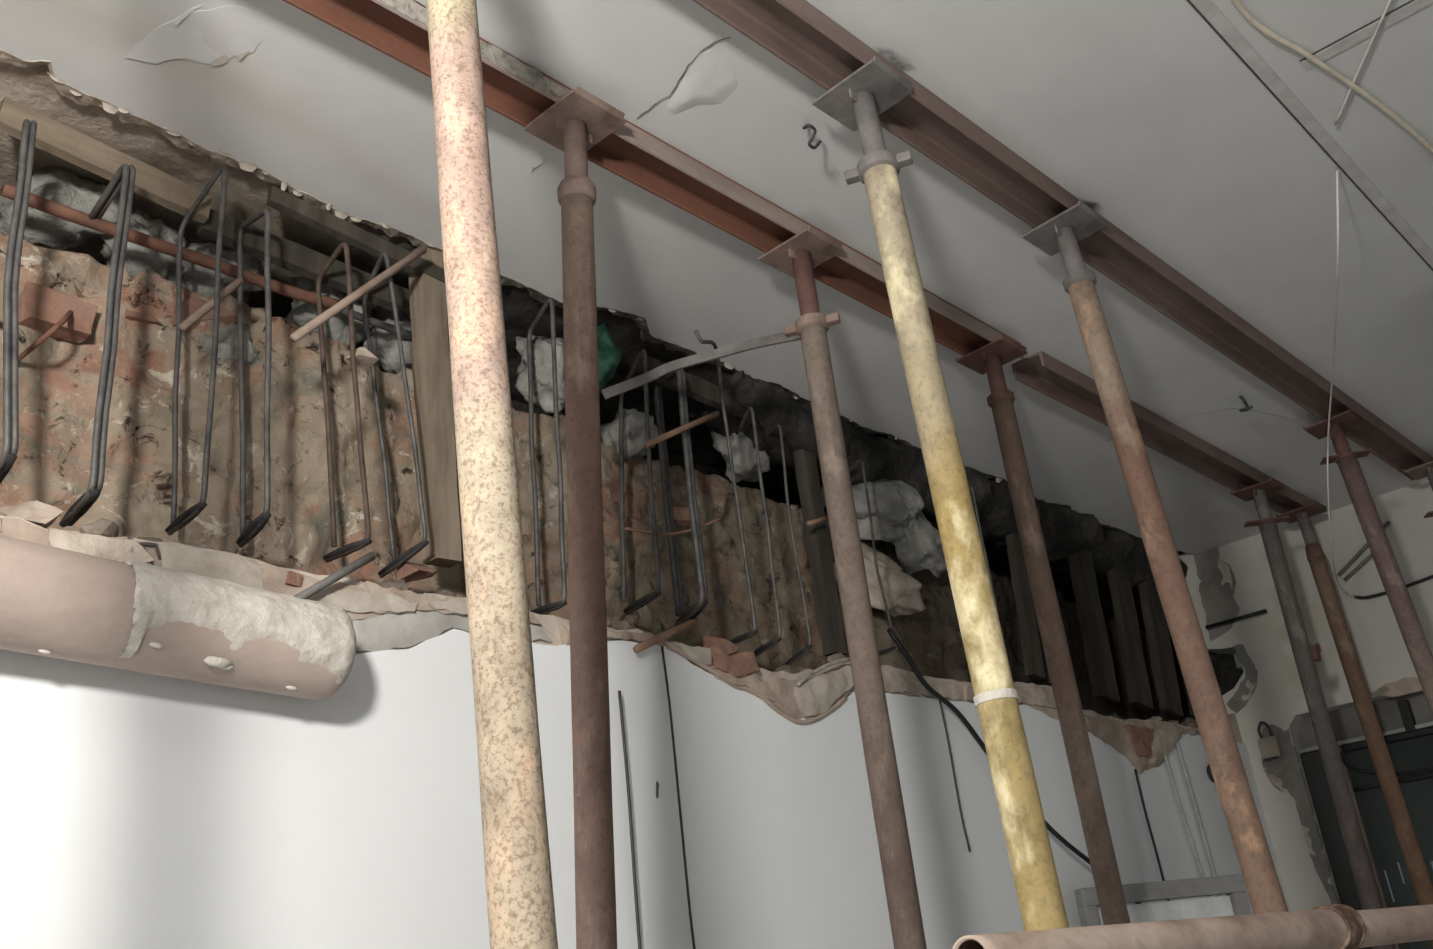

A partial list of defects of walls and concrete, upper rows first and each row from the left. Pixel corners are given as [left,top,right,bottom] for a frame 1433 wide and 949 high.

peeling [125,5,268,66]
flaking render [0,49,469,652]
spalling [500,275,570,645]
flaking render [597,307,855,725]
flaking render [840,415,922,451]
flaking render [849,459,974,702]
spalling [1097,582,1115,619]
spalling [1132,591,1146,631]
flaking render [1084,627,1200,774]
flaking render [1177,547,1258,713]
flaking render [1261,724,1339,905]